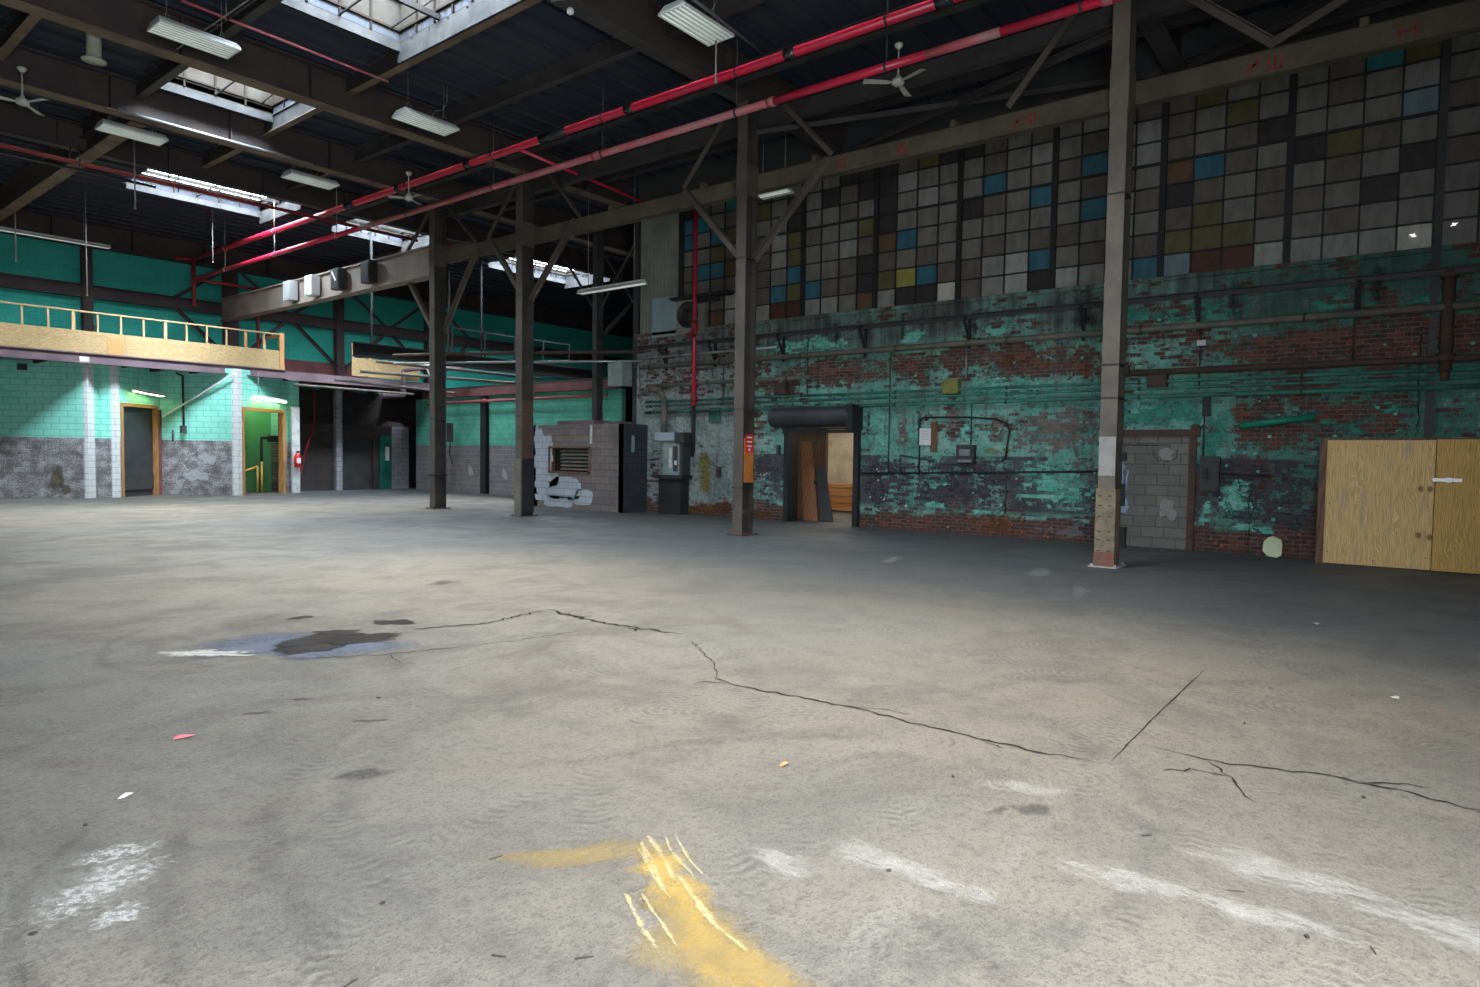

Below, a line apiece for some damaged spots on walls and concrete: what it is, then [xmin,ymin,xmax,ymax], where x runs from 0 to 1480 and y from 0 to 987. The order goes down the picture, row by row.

peeling [755,334,860,354]
peeling [862,321,1100,539]
peeling [754,453,778,508]
water stain [157,649,254,657]
water stain [273,630,398,655]
crack [276,609,1480,812]